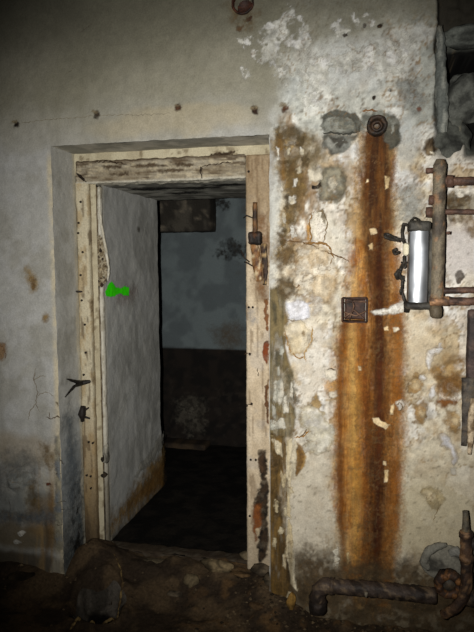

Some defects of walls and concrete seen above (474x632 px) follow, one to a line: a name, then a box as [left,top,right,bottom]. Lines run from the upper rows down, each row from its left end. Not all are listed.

peeling [237,4,410,107]
spalling [145,163,193,172]
spalling [423,137,437,156]
rust [333,124,405,582]
crack [28,368,60,419]
peeling [262,287,334,610]
rust [253,505,261,541]